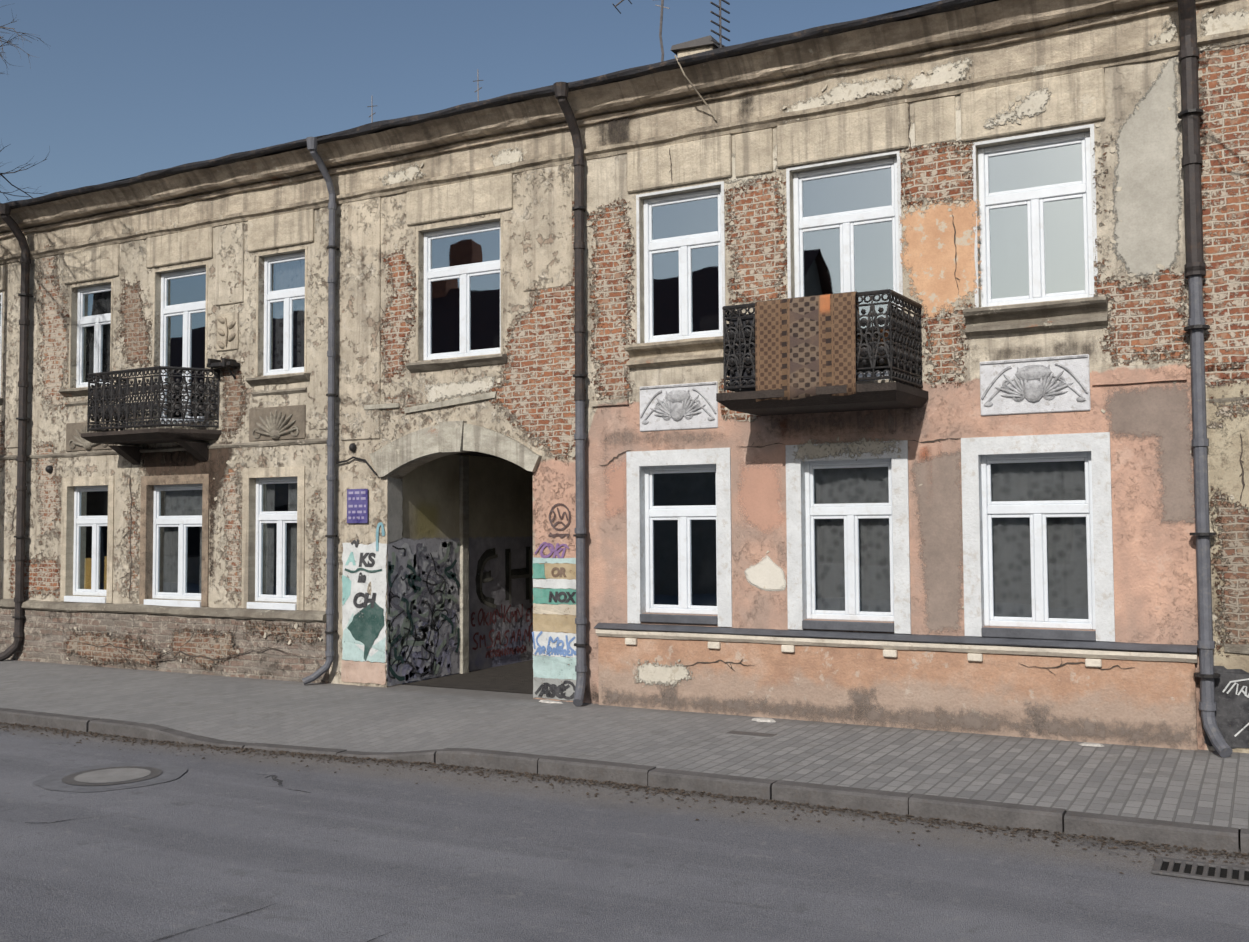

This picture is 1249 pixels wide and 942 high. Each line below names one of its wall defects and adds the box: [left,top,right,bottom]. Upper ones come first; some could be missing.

flaking render [782,57,973,122]
flaking render [983,86,1052,129]
flaking render [380,197,637,460]
flaking render [720,145,788,305]
peeling [895,102,982,388]
crack [952,215,960,294]
flaking render [1090,43,1249,430]
flaking render [0,420,10,472]
flaking render [7,438,62,599]
flaking render [1101,381,1249,657]
flaking render [633,658,694,690]
crack [1019,660,1135,675]